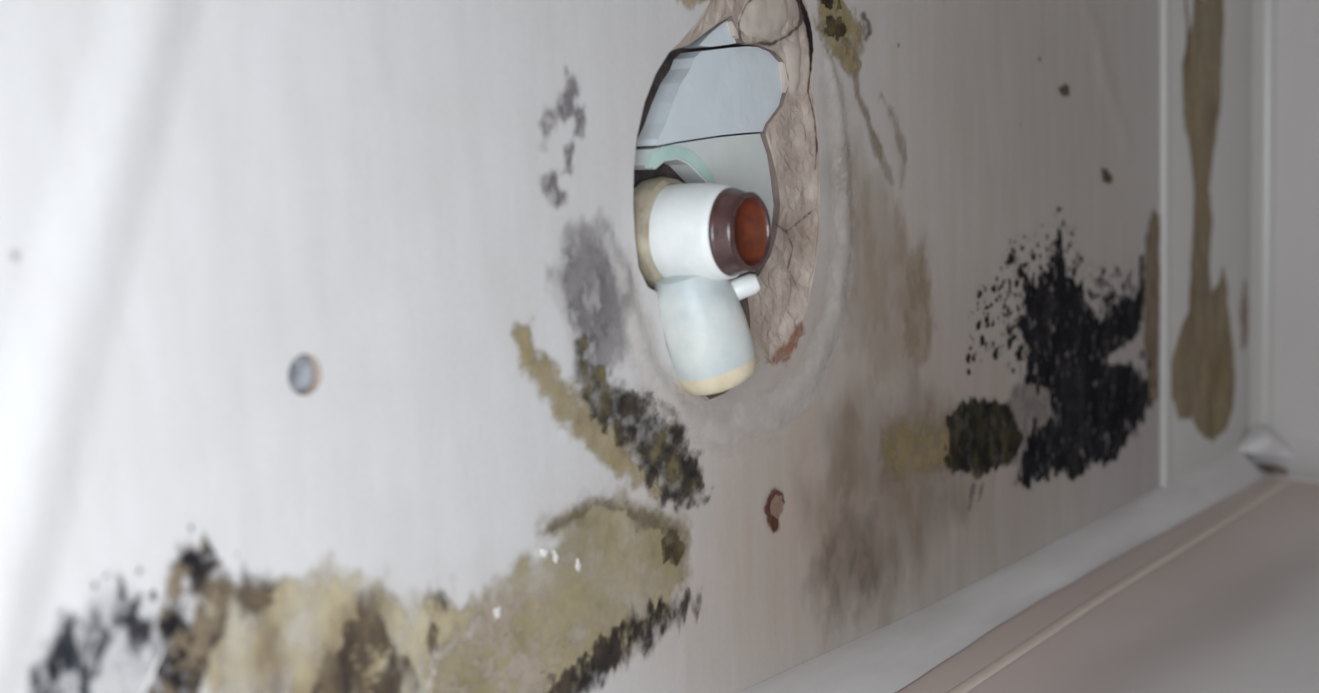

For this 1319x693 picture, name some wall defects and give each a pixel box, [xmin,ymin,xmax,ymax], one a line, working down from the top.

leakage [543,78,585,205]
flaking render [634,0,820,365]
leakage [818,0,882,159]
leakage [882,0,1235,508]
leakage [31,228,708,693]
rust [765,489,785,532]